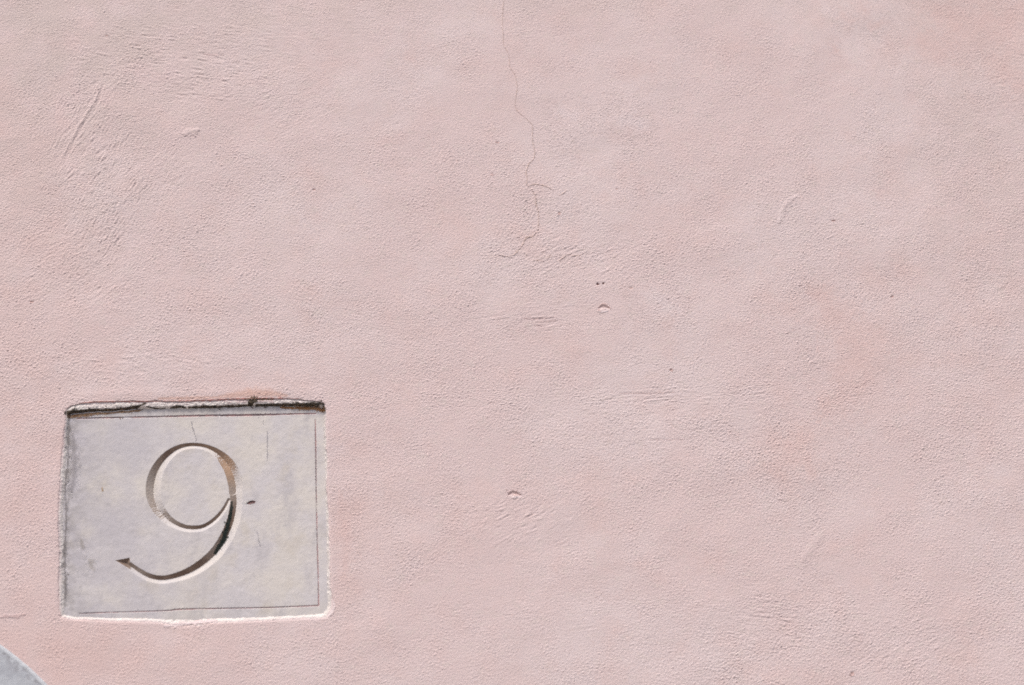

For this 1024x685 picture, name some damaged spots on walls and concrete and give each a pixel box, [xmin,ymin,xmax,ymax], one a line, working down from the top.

crack [498,0,584,262]